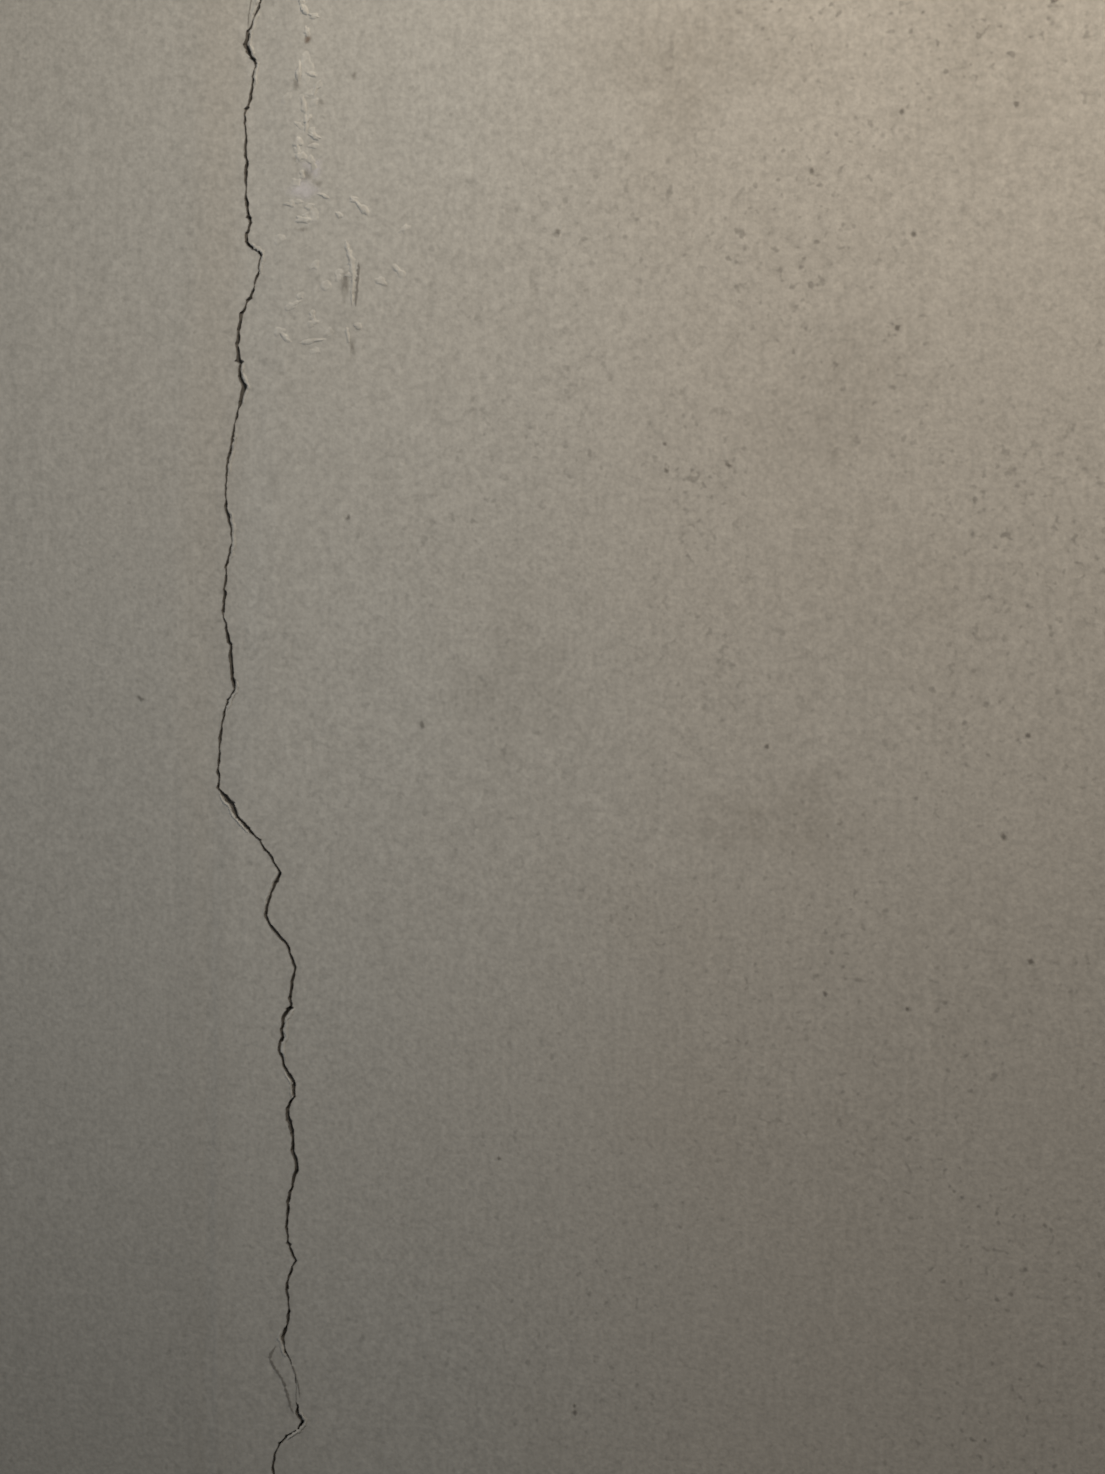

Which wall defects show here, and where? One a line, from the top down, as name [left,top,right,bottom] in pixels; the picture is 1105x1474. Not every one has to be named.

crack [216,0,308,1474]